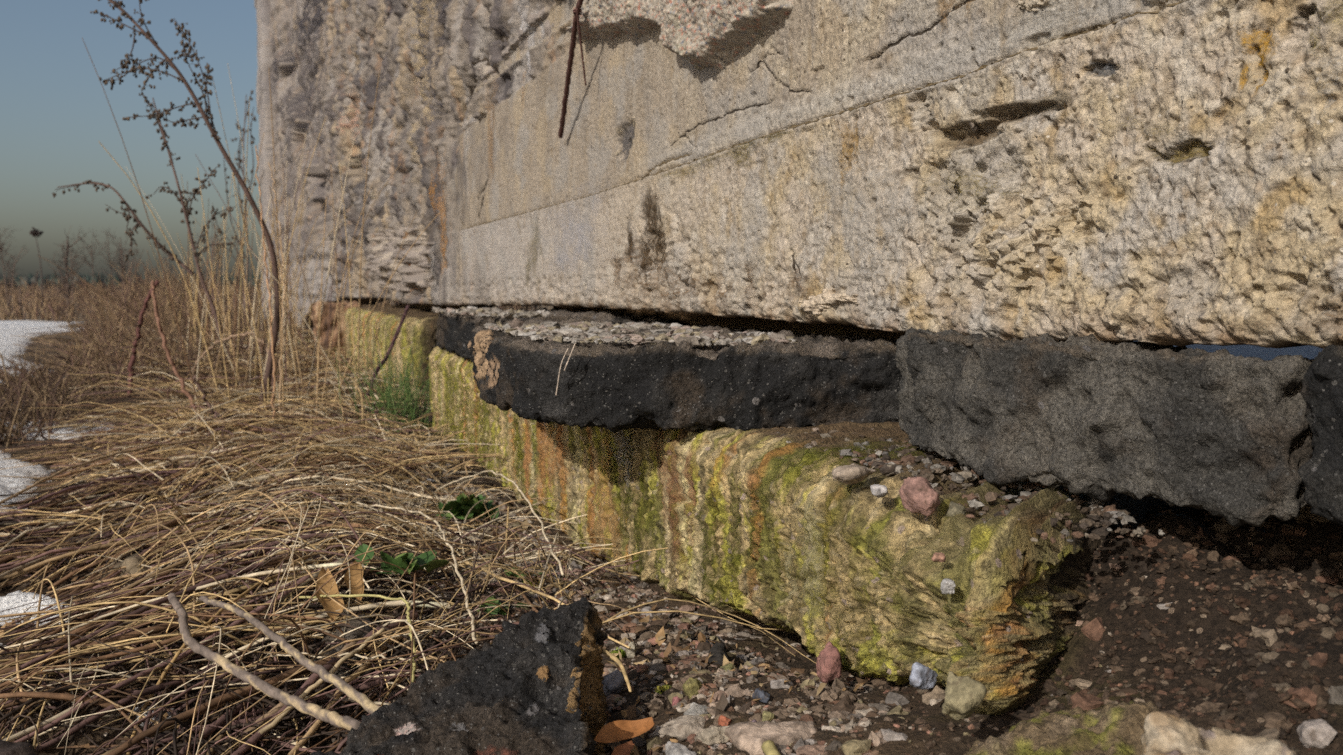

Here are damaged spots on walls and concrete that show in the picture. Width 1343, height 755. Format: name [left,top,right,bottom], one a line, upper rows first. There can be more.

spalling [477,0,794,138]
crack [459,0,1187,230]
damp [615,191,666,283]